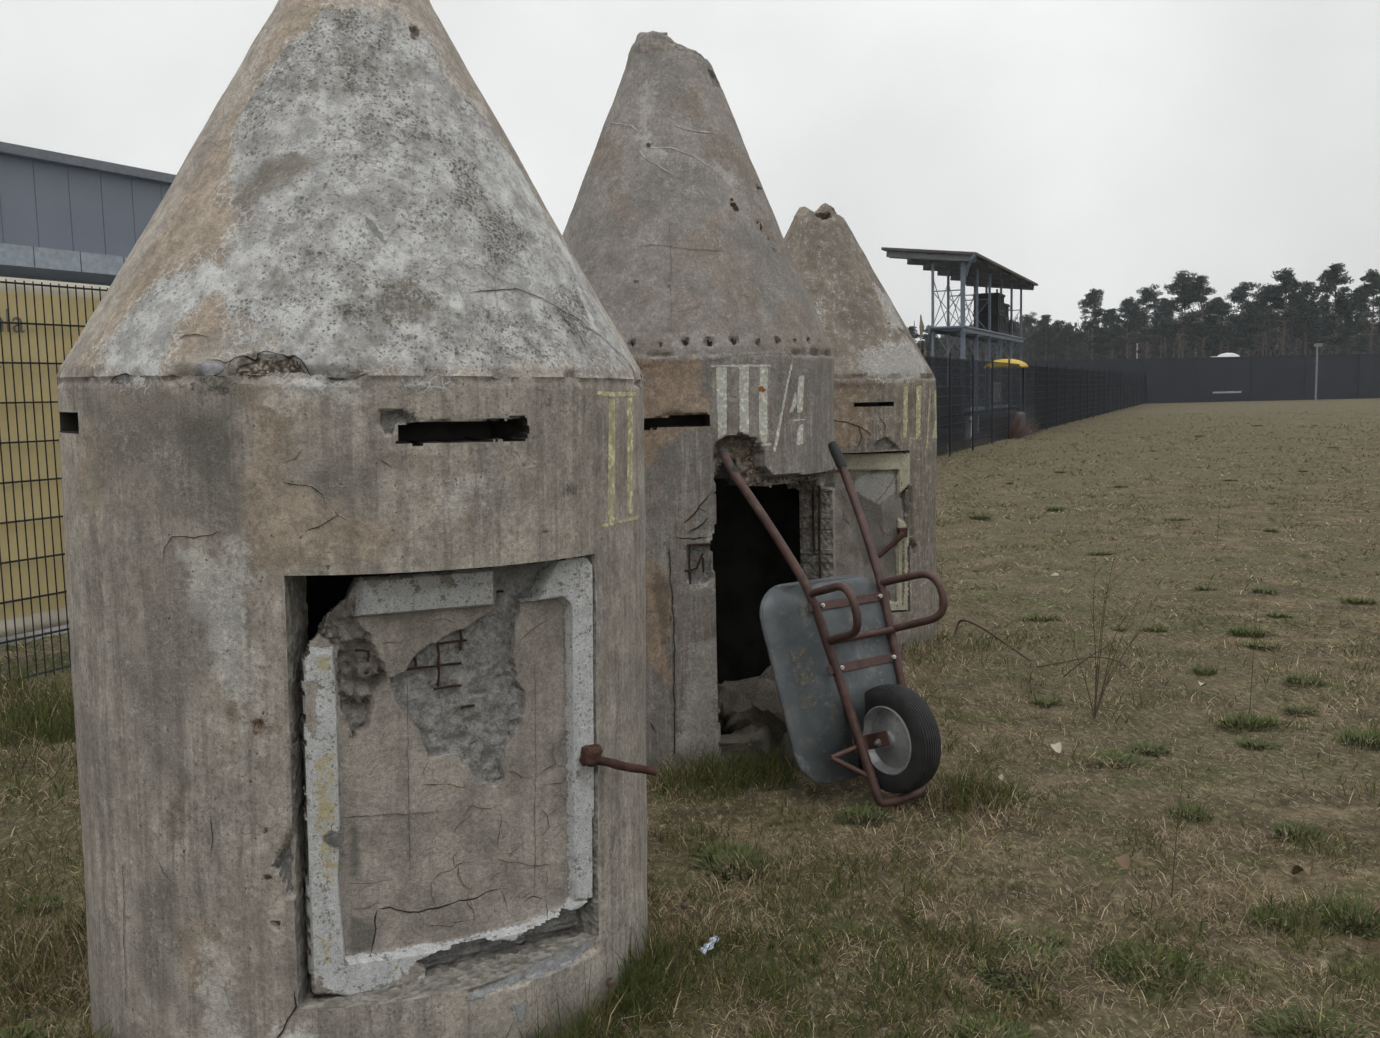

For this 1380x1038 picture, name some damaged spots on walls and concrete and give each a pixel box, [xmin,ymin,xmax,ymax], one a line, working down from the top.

spalling [236,358,306,377]
spalling [714,435,832,485]
crack [281,451,350,531]
crack [163,530,221,556]
crack [342,623,566,955]